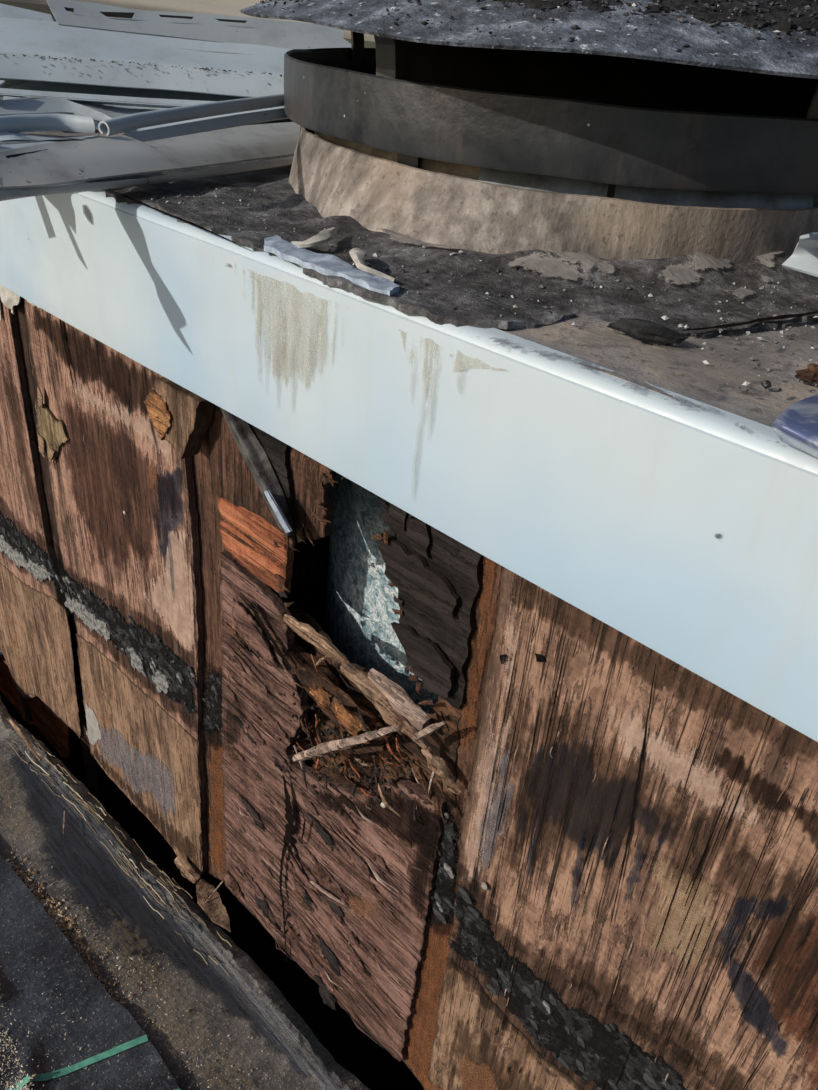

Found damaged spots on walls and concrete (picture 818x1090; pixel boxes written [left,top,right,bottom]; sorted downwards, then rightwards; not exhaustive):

water stain [33,308,183,600]
spalling [270,587,429,789]
crack [279,775,309,960]
peeling [307,812,334,852]
water stain [480,744,633,877]
water stain [716,748,818,849]
water stain [723,958,770,1034]